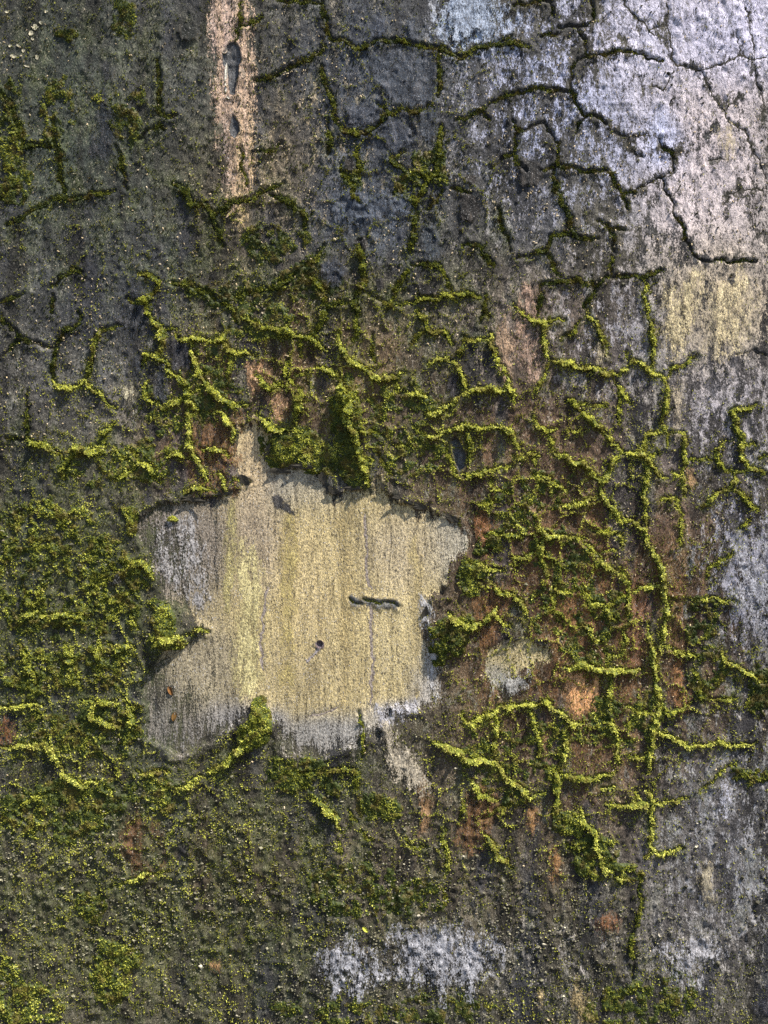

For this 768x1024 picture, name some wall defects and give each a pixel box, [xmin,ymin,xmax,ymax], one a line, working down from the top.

peeling [0,4,673,768]
crack [126,0,767,511]
peeling [421,57,764,265]
damp [314,920,518,1009]